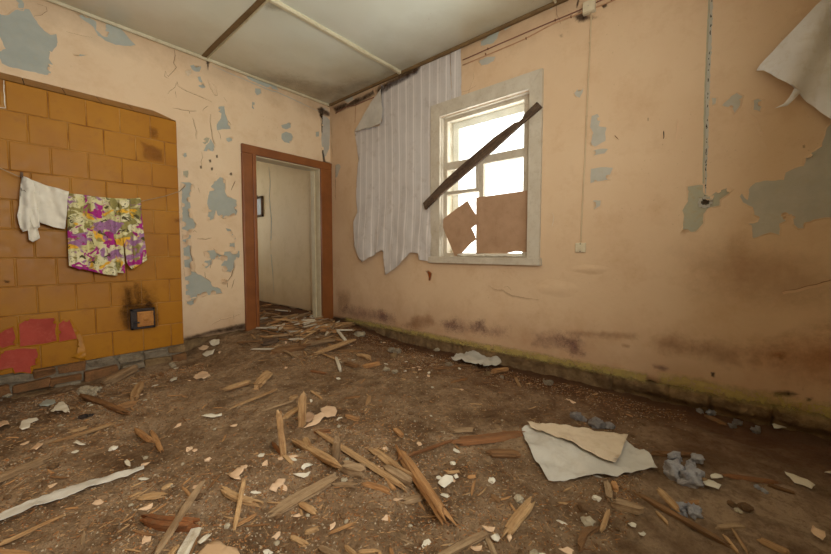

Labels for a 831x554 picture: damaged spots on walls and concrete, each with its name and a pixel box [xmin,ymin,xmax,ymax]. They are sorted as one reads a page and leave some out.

peeling [0,0,59,77]
peeling [75,12,137,47]
peeling [216,105,233,143]
peeling [679,121,831,239]
peeling [180,136,240,306]
peeling [0,317,86,374]